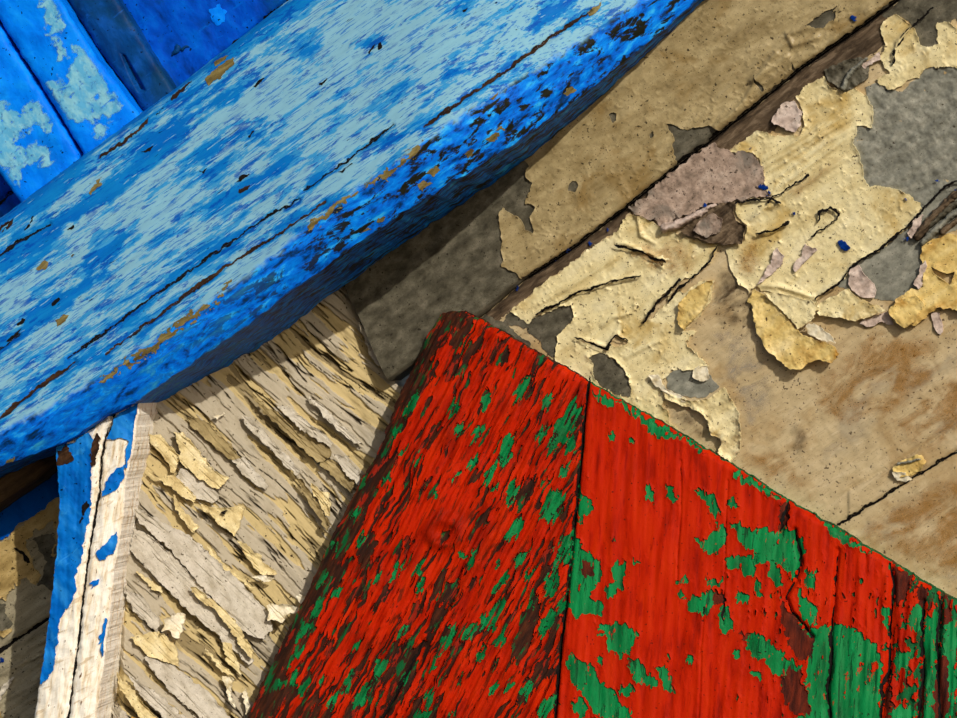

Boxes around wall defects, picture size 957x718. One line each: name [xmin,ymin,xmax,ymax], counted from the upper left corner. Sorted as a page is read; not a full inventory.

peeling [0,100,54,187]
peeling [0,404,138,684]
peeling [37,0,123,139]
crack [66,428,109,718]
peeling [99,279,232,383]
crack [0,124,394,419]
peeling [205,55,234,86]
peeling [111,412,344,718]
peeling [242,390,368,552]
peeling [307,140,424,231]
peeling [326,484,676,718]
peeling [383,0,957,718]